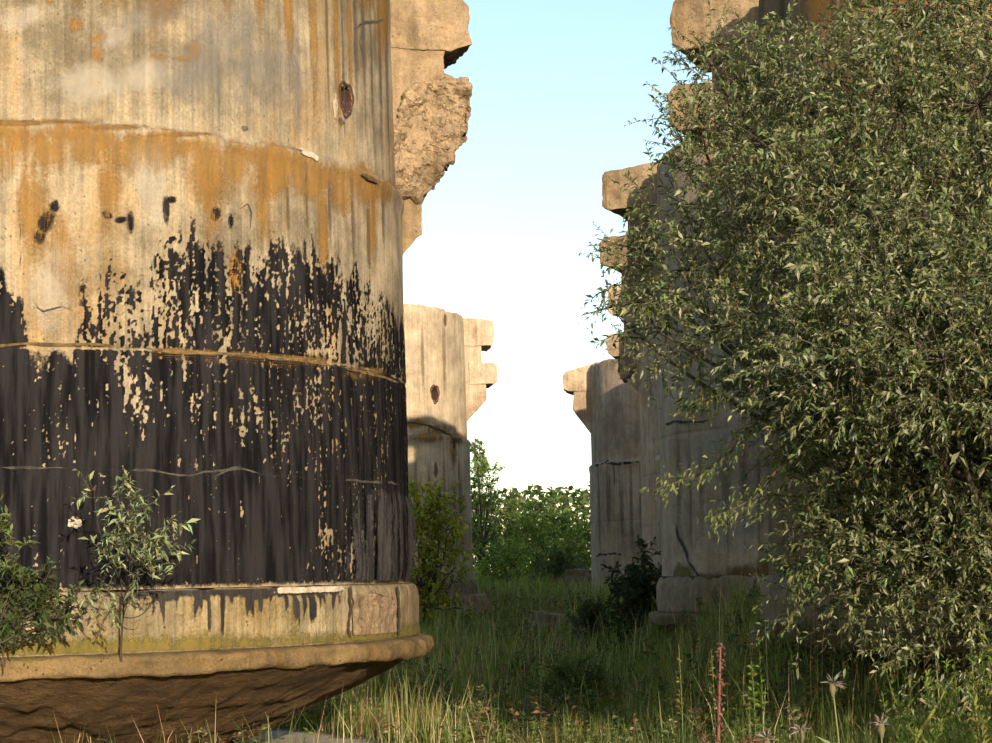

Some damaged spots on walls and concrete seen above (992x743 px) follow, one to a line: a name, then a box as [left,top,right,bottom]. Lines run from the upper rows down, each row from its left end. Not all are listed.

spalling [333,93,345,126]
rust [0,121,395,269]
rust [230,256,243,292]
spalling [68,516,82,529]
spalling [274,586,397,635]